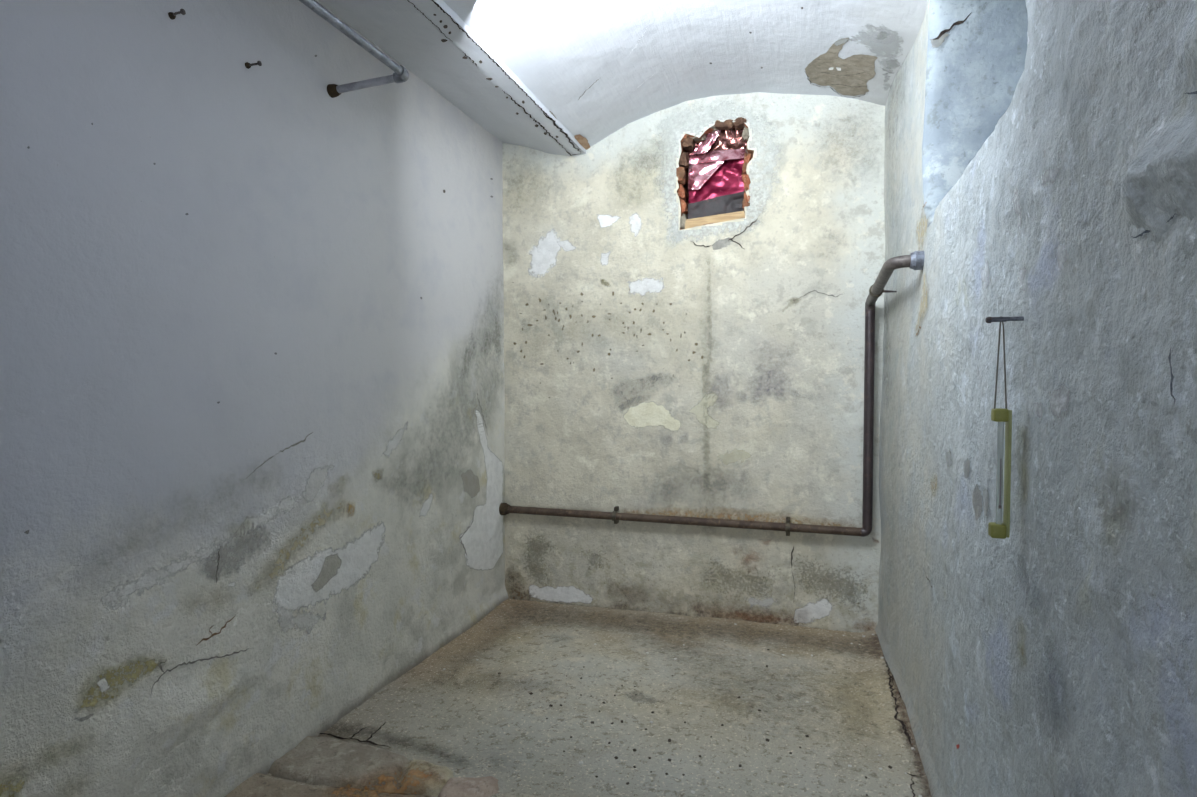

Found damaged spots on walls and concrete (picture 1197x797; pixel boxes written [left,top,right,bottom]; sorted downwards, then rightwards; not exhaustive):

spalling [805,38,878,98]
crack [930,12,972,48]
spalling [676,117,757,250]
damp [514,279,703,364]
peeling [623,393,719,431]
crack [249,432,313,476]
peeling [459,393,503,570]
peeling [274,523,385,612]
peeling [529,585,593,604]
damp [76,660,159,721]
crack [151,616,249,694]
crack [886,662,916,797]